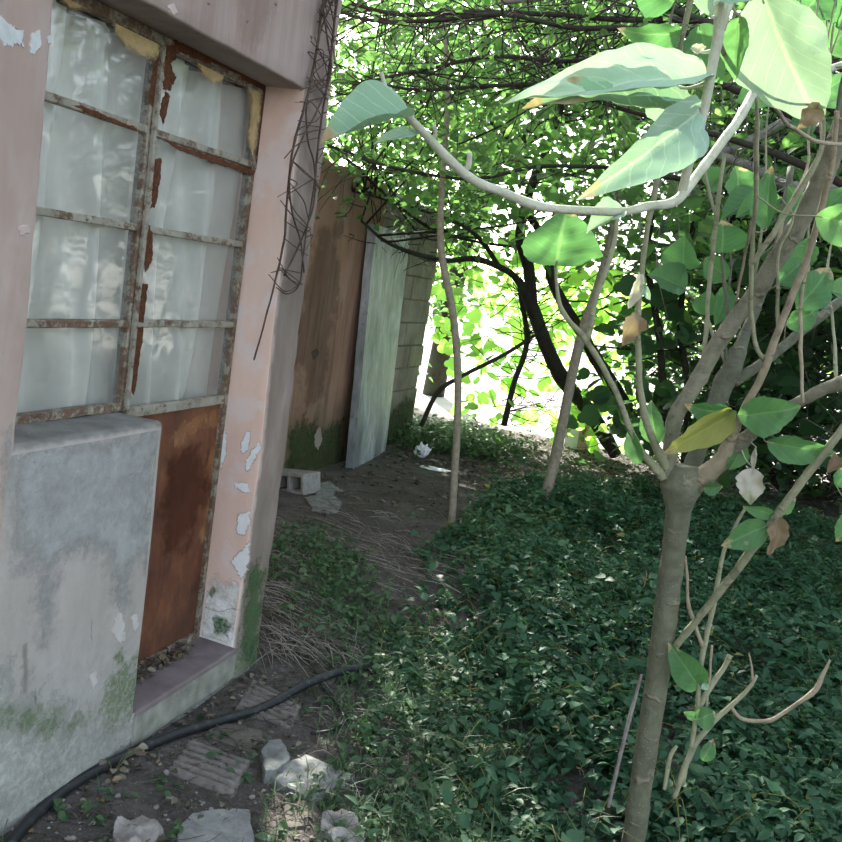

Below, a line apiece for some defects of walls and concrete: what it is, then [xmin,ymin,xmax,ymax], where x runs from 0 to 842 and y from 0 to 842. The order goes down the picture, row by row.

peeling [0,15,52,55]
rust [72,105,137,131]
rust [149,40,266,175]
rust [150,158,162,209]
rust [144,225,153,272]
rust [131,283,148,396]
peeling [240,430,262,472]
rust [162,410,220,551]
flaking render [7,431,159,644]
leakage [213,617,230,634]
leakage [99,652,137,729]